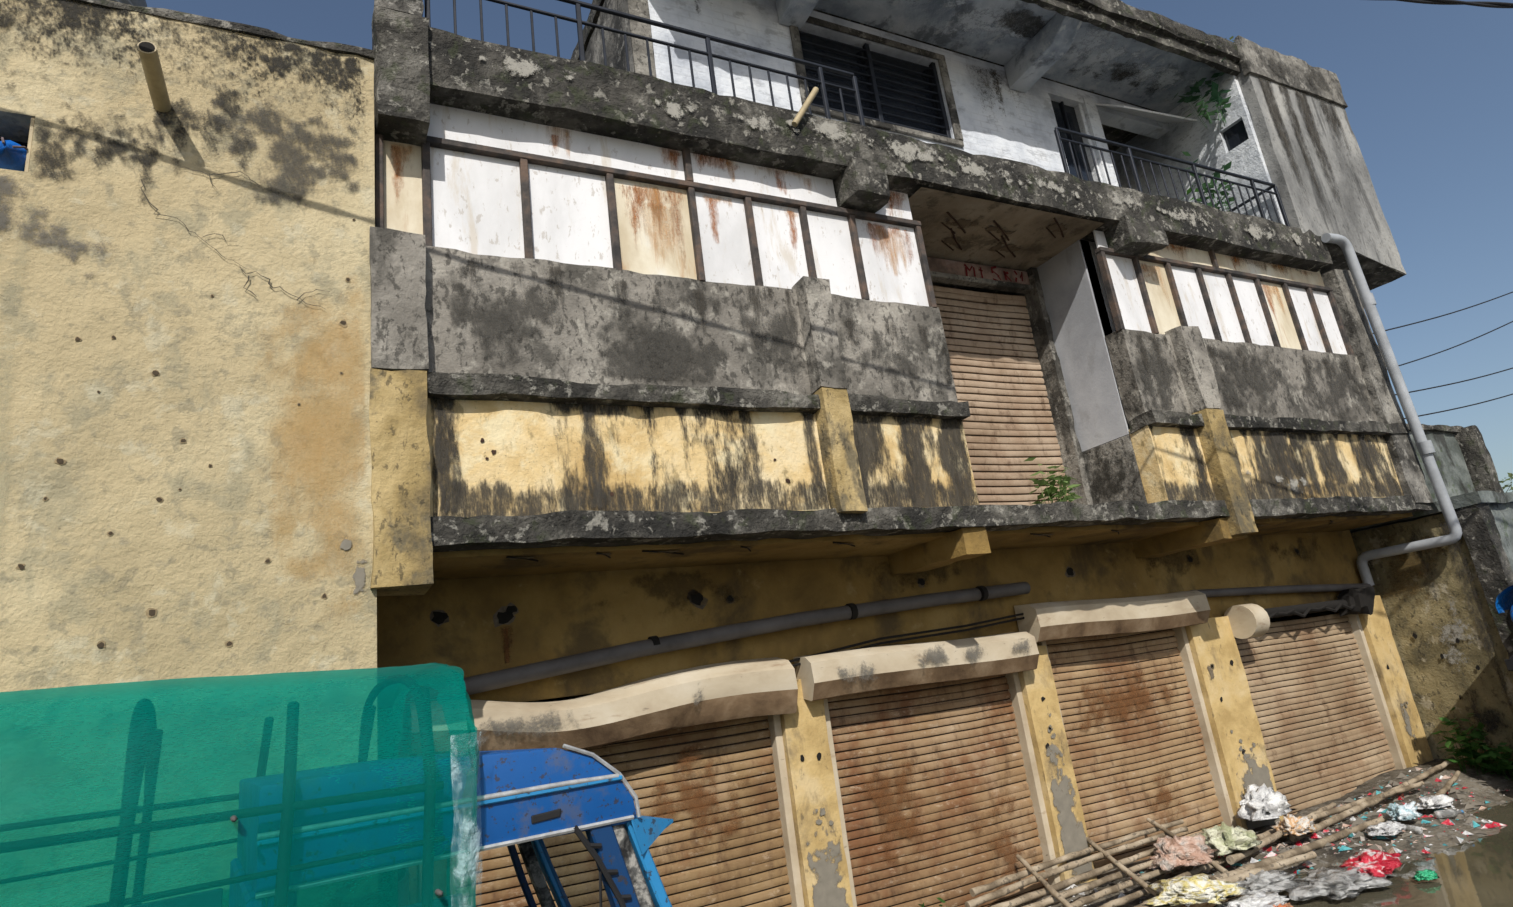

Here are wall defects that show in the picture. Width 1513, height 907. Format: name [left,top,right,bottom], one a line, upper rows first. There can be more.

water stain [0,175,105,262]
water stain [0,0,364,206]
crack [179,167,260,189]
crack [140,179,330,309]
corrosion [626,187,680,235]
water stain [1259,55,1348,198]
water stain [451,257,564,367]
water stain [601,285,801,382]
water stain [430,398,830,517]
water stain [852,415,979,508]
peeling [1041,697,1095,883]
peeling [807,808,849,907]